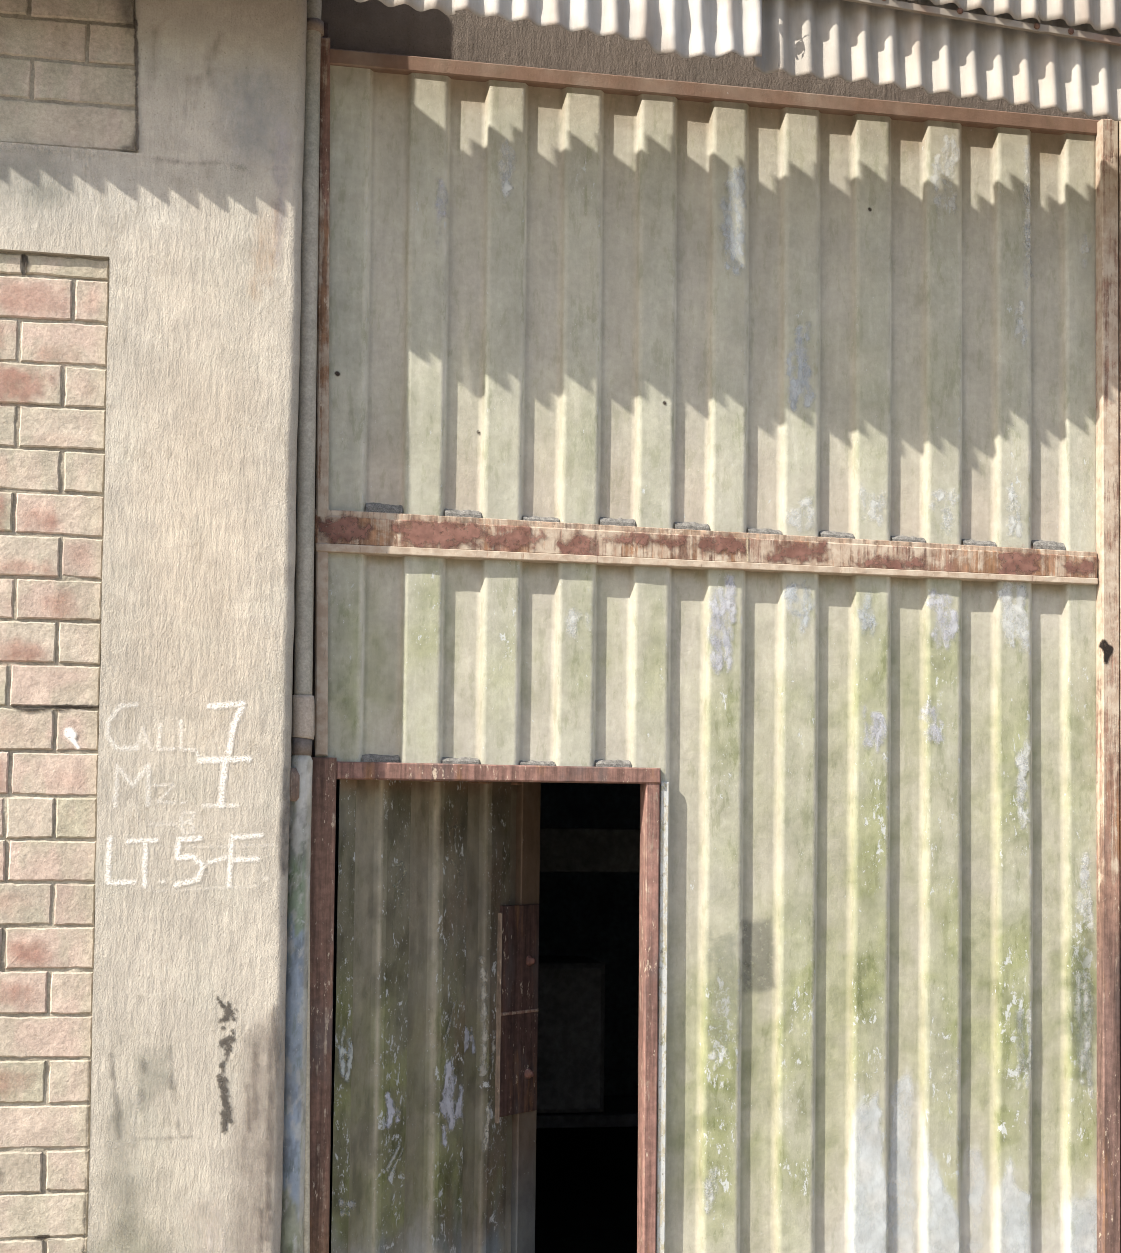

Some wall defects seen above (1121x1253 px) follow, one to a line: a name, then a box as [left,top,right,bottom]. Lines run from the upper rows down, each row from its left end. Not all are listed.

rust [392,518,595,555]
rust [615,532,746,556]
rust [767,540,827,564]
rust [857,555,923,570]
peeling [464,958,496,1076]
peeling [340,1042,353,1079]
damp [216,996,277,1253]
peeling [386,1093,400,1128]
peeling [440,1062,463,1146]
damp [854,1080,913,1253]
damp [929,1173,975,1253]
damp [1003,1161,1031,1253]